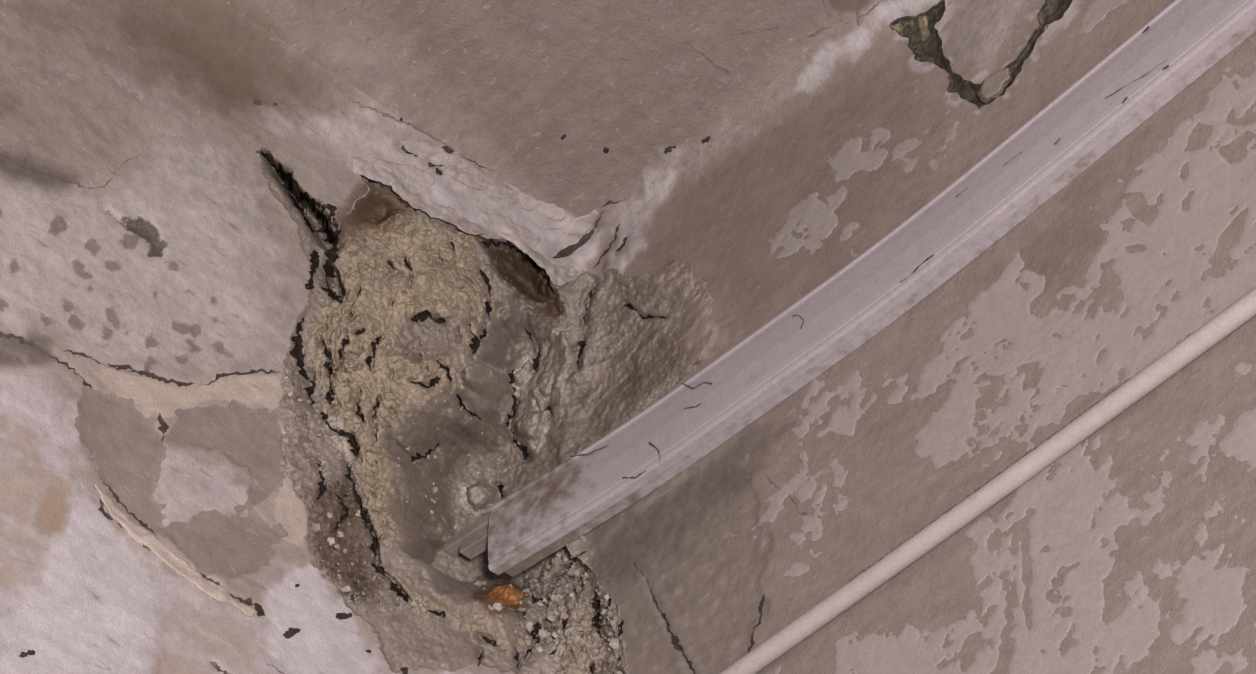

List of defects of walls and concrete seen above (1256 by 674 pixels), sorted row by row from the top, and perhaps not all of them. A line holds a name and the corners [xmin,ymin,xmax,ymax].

peeling [1079,0,1127,34]
peeling [751,61,1256,577]
crack [0,332,276,388]
crack [157,413,169,442]
flaking render [256,140,715,674]
crack [99,482,155,551]
flaking render [93,482,265,618]
peeling [834,408,1256,674]
corrosion [475,581,527,613]
crack [633,563,695,674]
crack [210,661,231,674]